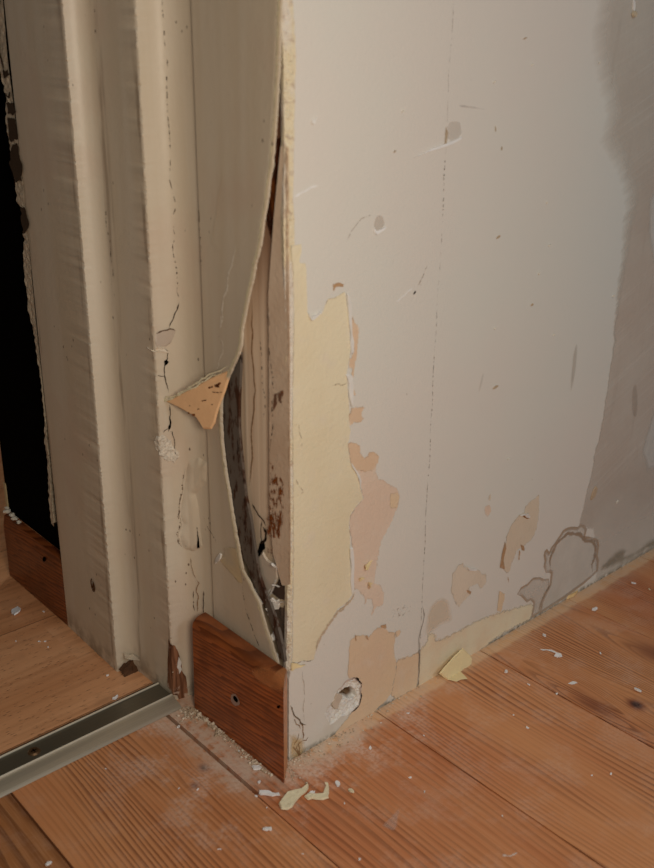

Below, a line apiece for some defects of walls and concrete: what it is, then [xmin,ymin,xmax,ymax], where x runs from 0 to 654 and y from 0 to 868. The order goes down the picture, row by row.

peeling [252,0,400,672]
crack [158,354,176,454]
peeling [500,495,539,581]
leakage [518,524,623,618]